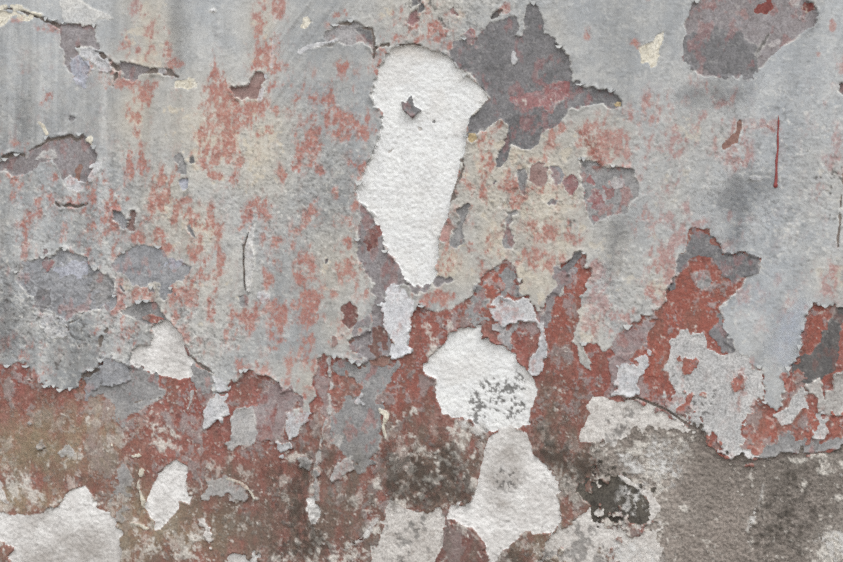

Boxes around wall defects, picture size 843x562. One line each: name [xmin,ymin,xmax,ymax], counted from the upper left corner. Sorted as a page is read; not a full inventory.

peeling [59,0,150,89]
peeling [681,0,817,80]
peeling [0,121,102,192]
peeling [113,210,136,231]
flaking render [341,0,639,362]
peeling [0,227,843,562]